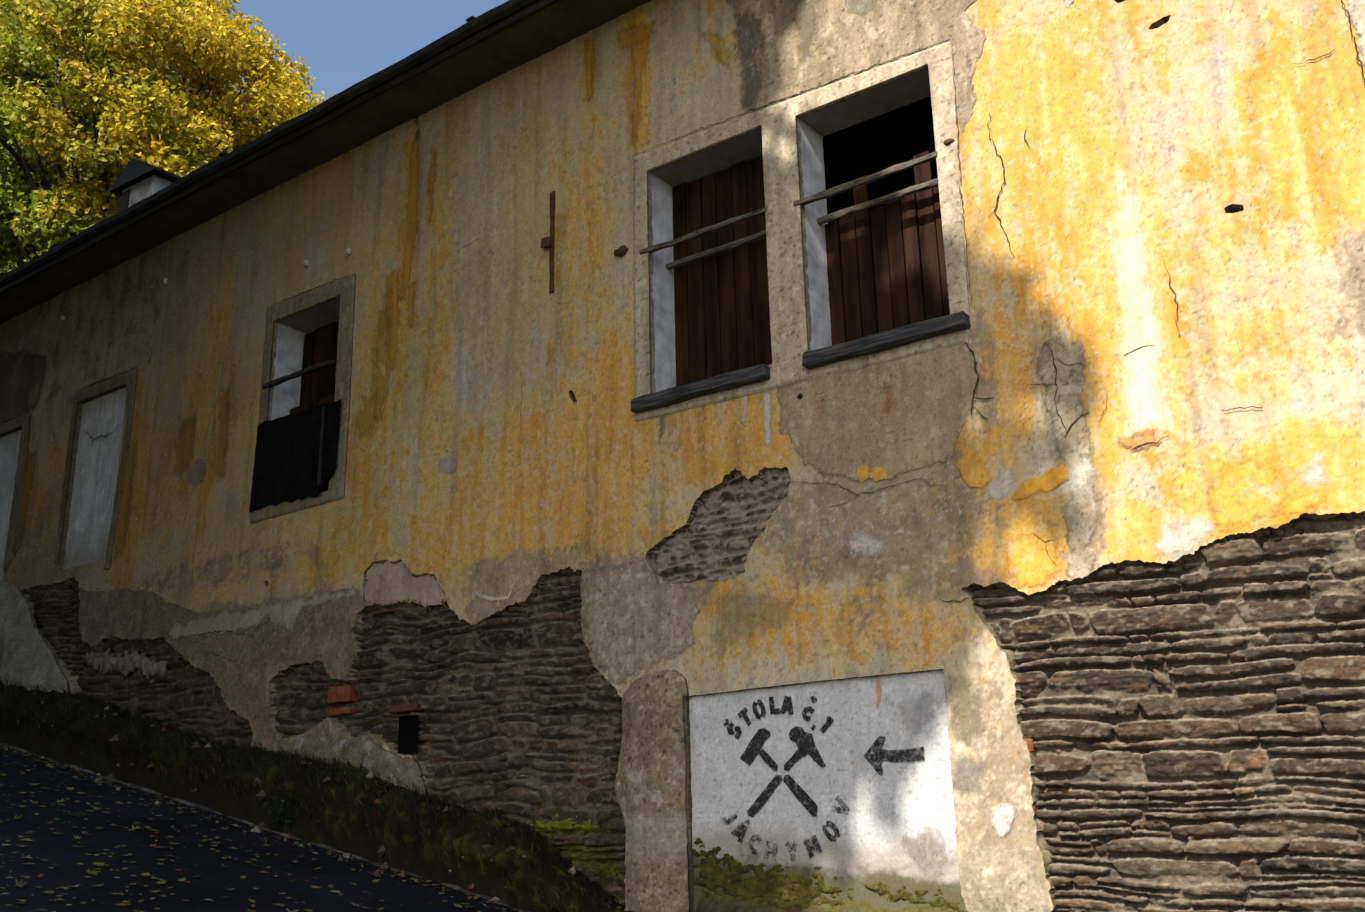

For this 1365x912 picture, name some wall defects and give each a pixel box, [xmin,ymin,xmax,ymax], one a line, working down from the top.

crack [638,38,1030,307]
crack [1124,262,1179,356]
crack [965,342,994,420]
crack [1031,341,1108,437]
spalling [645,467,791,585]
spalling [957,337,1365,912]
spalling [22,559,626,910]